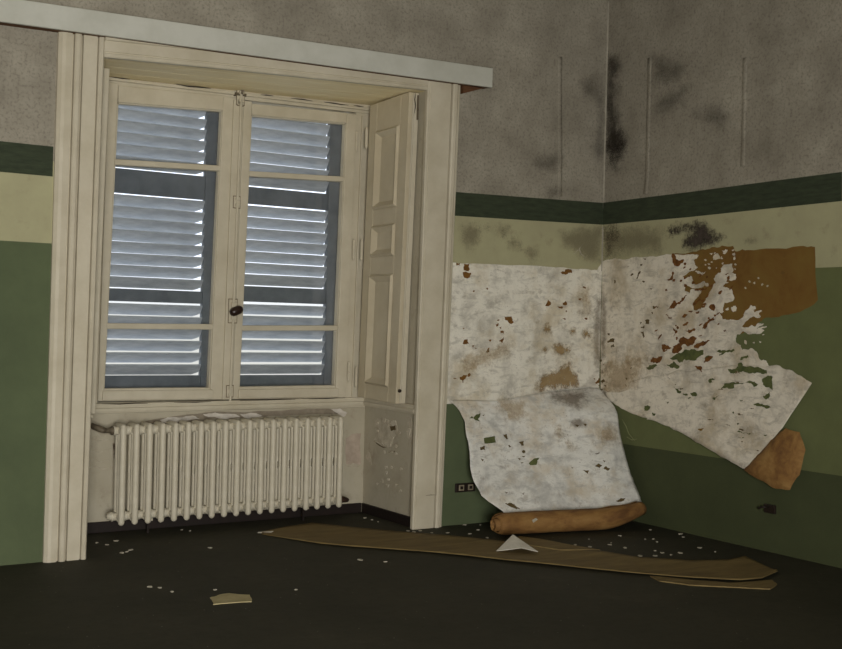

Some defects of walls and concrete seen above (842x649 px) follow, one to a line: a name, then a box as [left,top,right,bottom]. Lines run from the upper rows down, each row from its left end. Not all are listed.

damp [607,59,624,153]
damp [668,220,722,251]
peeling [447,249,773,409]
peeling [480,434,539,465]